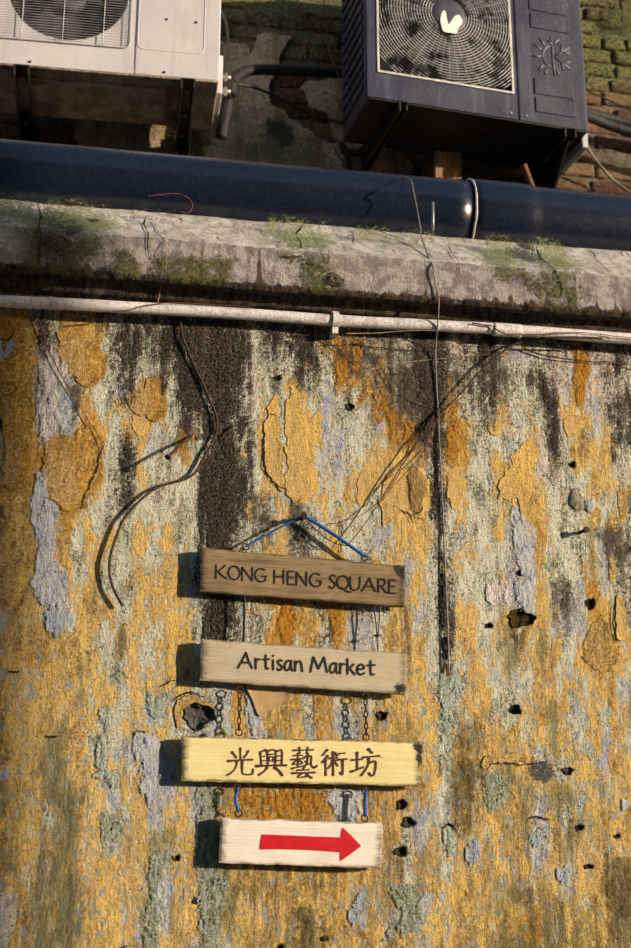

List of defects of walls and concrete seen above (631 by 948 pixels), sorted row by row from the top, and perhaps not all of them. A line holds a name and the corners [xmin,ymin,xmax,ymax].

peeling [441,10,462,33]
crack [35,204,43,265]
leakage [41,209,100,255]
crack [142,216,150,256]
leakage [506,240,539,264]
crack [536,248,563,299]
leakage [527,362,561,470]
peeling [0,322,108,639]
leakage [107,313,516,684]
peeling [484,438,539,628]
peeling [128,728,161,811]
crack [488,761,547,769]